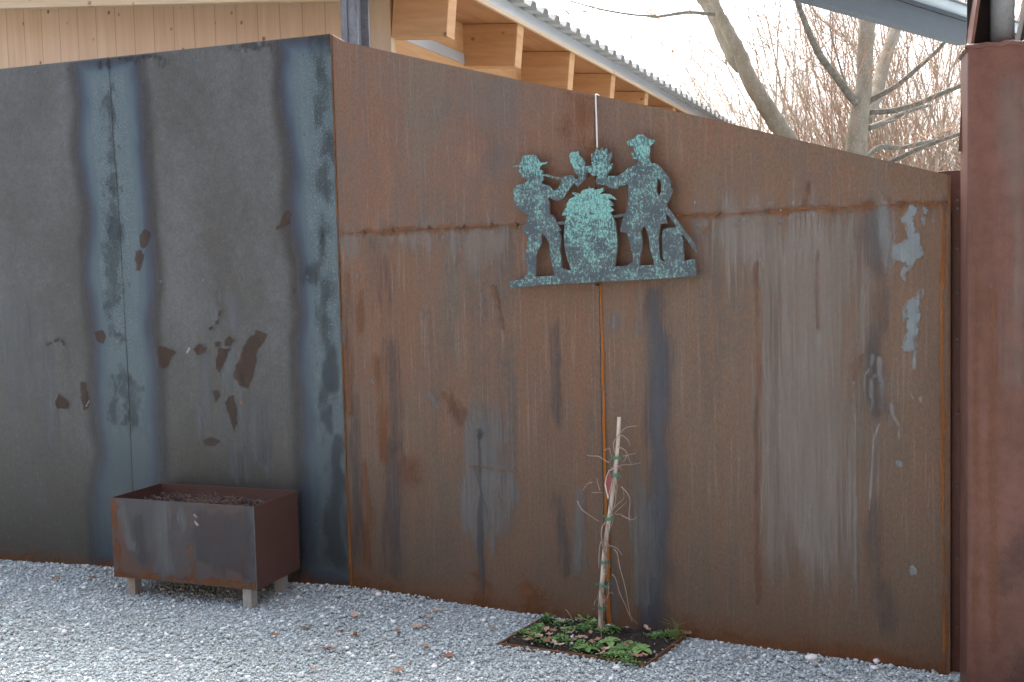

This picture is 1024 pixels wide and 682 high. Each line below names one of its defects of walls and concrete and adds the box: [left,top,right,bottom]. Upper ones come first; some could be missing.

peeling [892,205,928,280]
rust [55,394,68,409]
rust [158,347,176,368]
rust [194,331,267,388]
rust [225,396,243,429]
peeling [902,293,921,369]
rust [892,202,947,574]
rust [600,284,612,625]
rust [712,630,791,651]
rust [805,646,907,666]